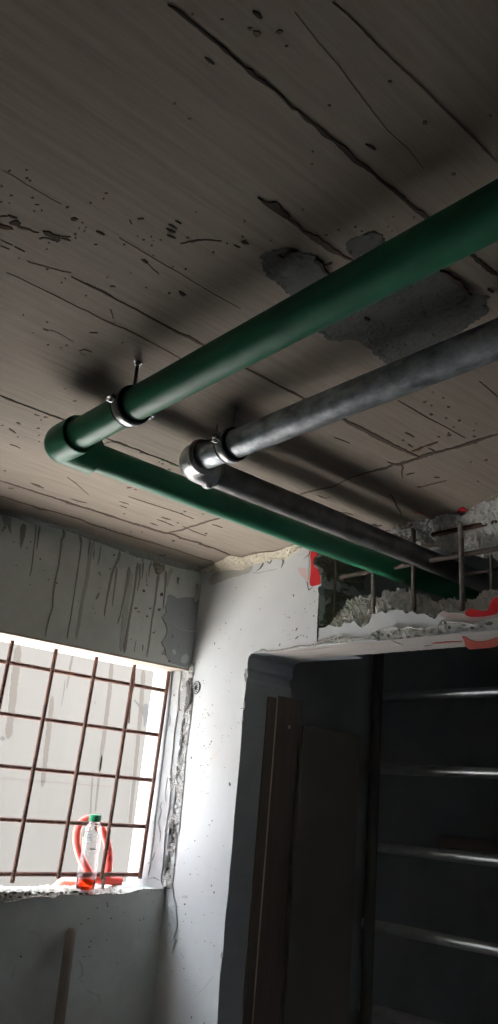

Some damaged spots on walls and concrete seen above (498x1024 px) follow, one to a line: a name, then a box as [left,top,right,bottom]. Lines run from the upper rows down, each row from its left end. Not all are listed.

crack [168,4,429,219]
crack [0,226,70,252]
crack [71,276,204,346]
spalling [259,240,332,296]
crack [287,219,353,261]
spalling [318,271,494,364]
crack [299,400,498,517]
spalling [386,494,498,561]
damp [67,535,101,639]
damp [104,551,199,667]
spalling [253,554,498,653]
spalling [0,635,245,889]